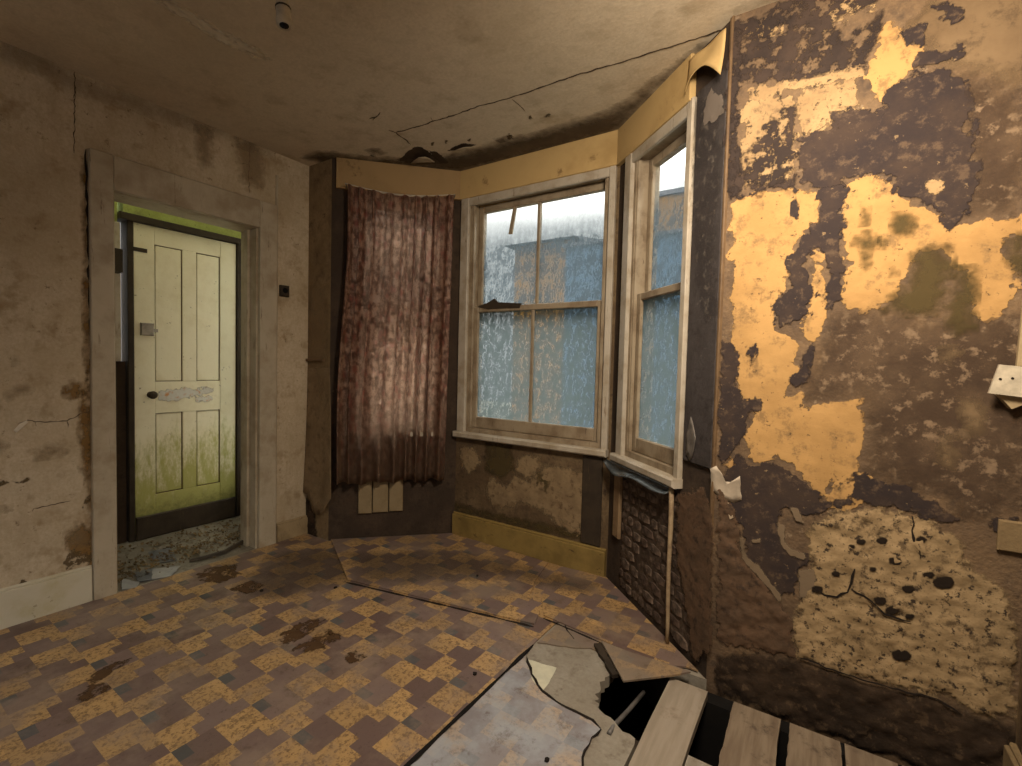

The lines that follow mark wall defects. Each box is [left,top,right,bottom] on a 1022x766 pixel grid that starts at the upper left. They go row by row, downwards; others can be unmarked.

peeling [823,0,876,32]
peeling [400,143,474,164]
damp [309,92,649,171]
crack [370,29,722,145]
peeling [703,88,725,126]
damp [723,0,1022,327]
peeling [459,446,481,474]
peeling [486,455,583,537]
spalling [714,20,1022,766]
damp [717,245,1022,596]